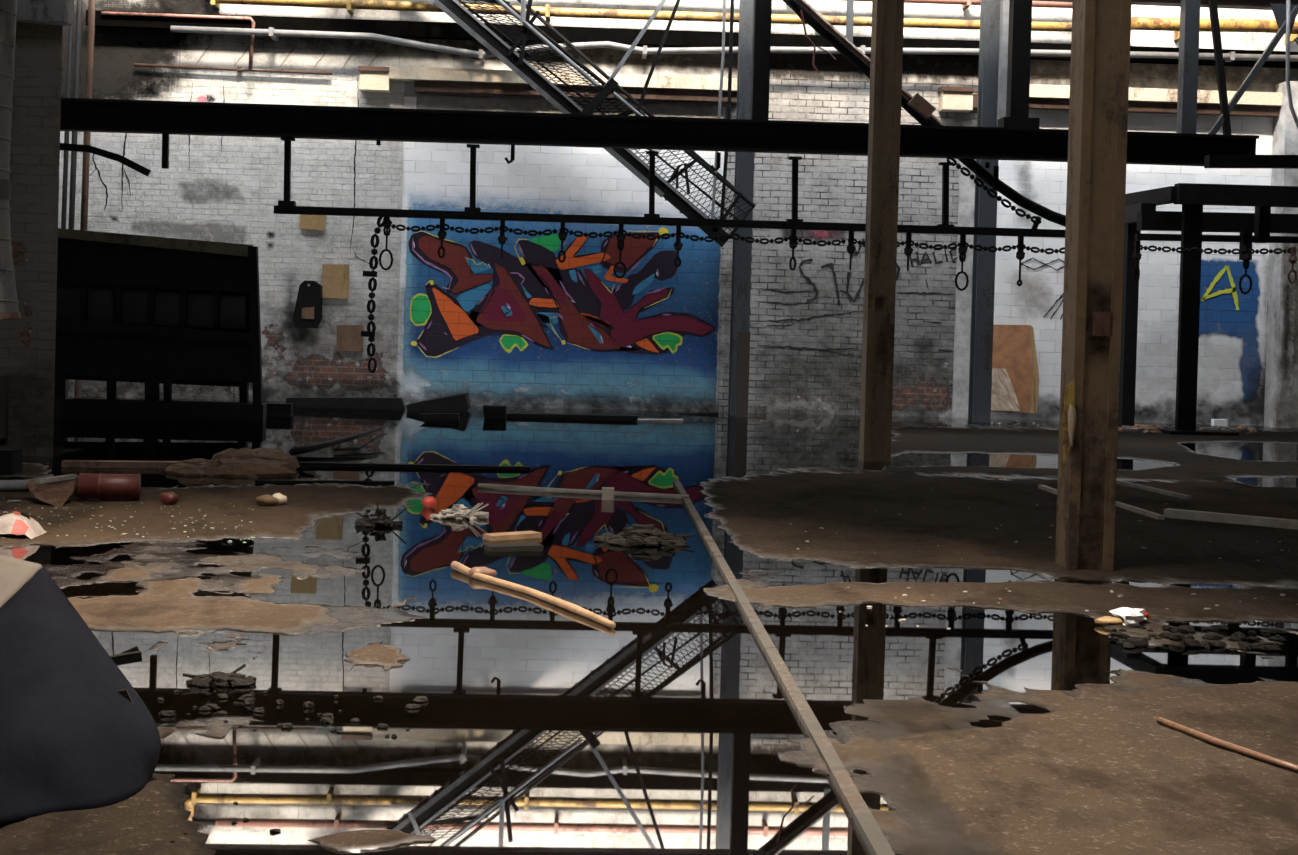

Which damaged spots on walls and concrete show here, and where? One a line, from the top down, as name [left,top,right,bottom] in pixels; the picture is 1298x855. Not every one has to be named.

flaking render [262,319,389,389]
flaking render [892,377,953,412]